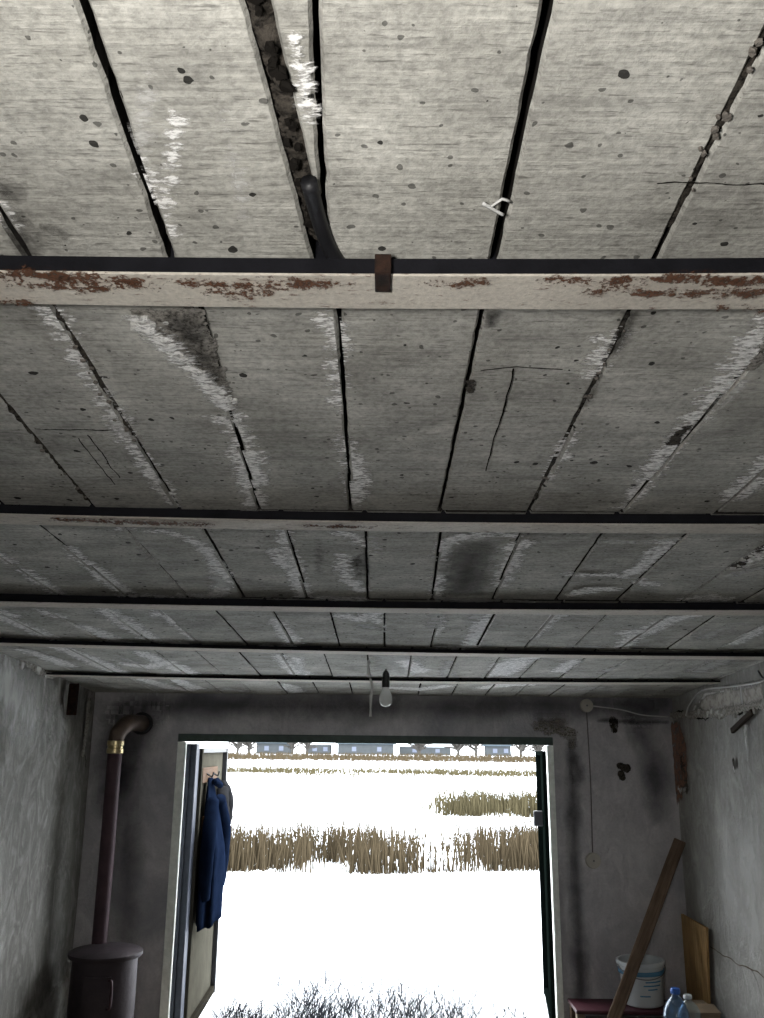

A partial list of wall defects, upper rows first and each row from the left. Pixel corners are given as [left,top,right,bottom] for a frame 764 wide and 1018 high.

leakage [288,34,321,124]
leakage [132,110,187,237]
crack [657,179,764,187]
rust [0,265,161,306]
rust [172,276,352,300]
rust [418,277,489,289]
rust [537,270,764,315]
crack [481,366,563,471]
leakage [612,315,764,509]
leakage [427,532,538,603]
leakage [375,655,456,691]
leakage [473,657,538,689]